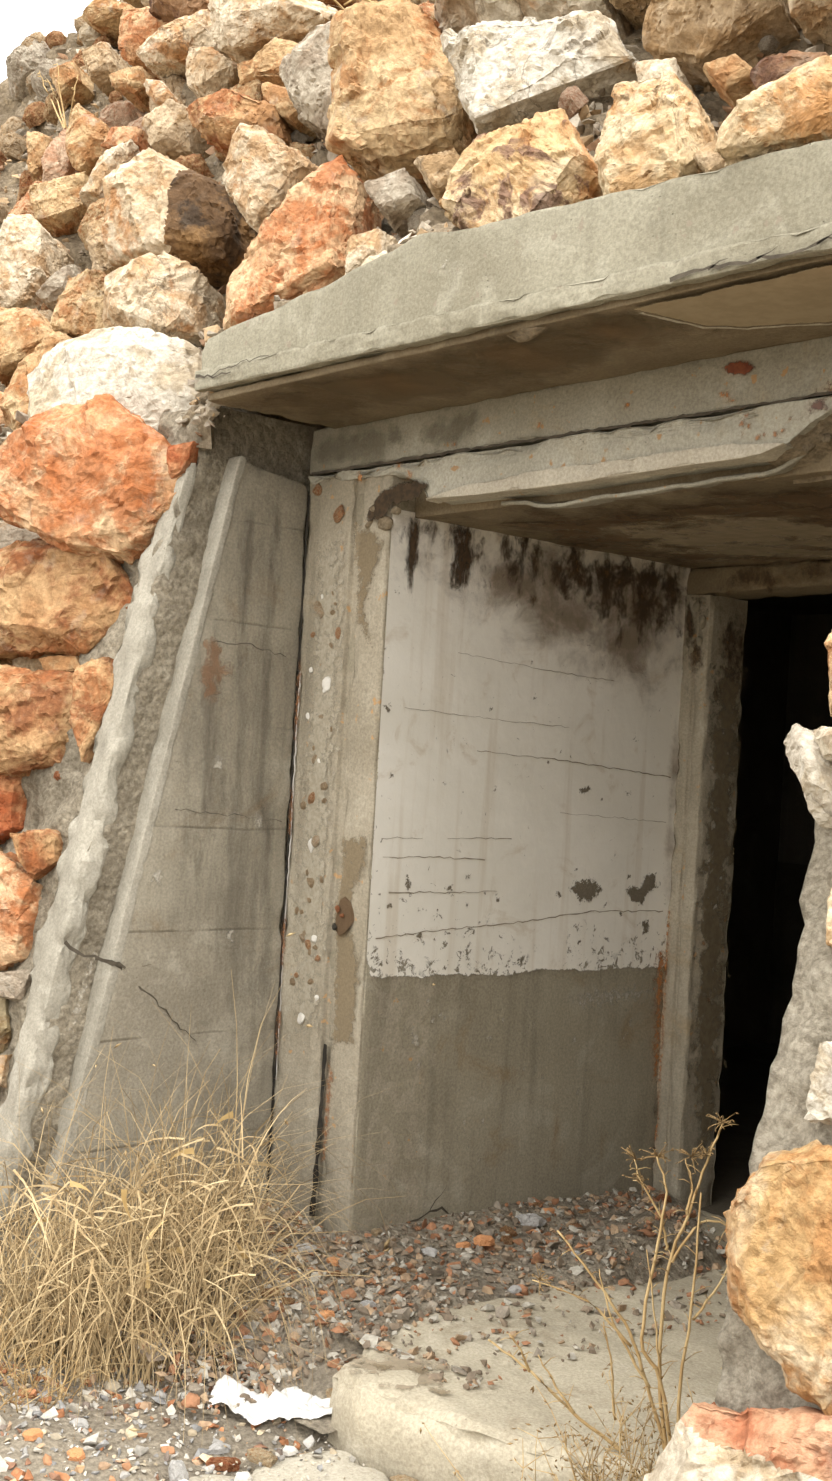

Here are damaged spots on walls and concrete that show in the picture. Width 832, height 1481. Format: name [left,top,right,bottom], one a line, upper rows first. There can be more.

peeling [501,414,832,509]
water stain [406,519,419,588]
water stain [450,517,473,588]
water stain [493,487,832,670]
peeling [290,480,706,1044]